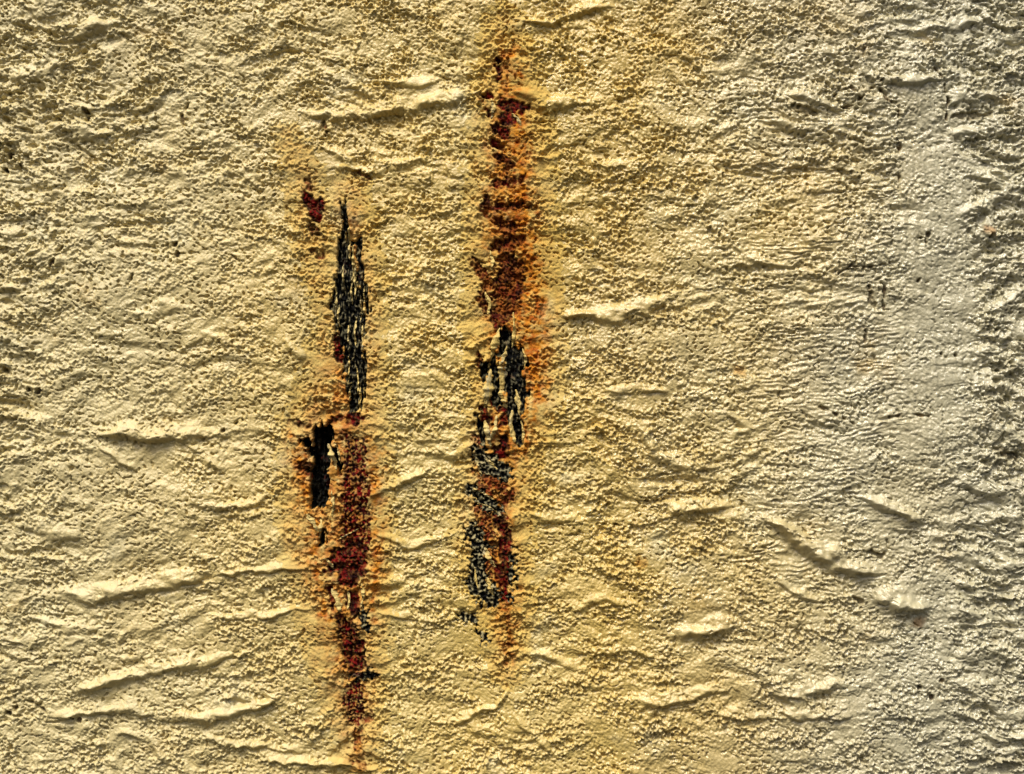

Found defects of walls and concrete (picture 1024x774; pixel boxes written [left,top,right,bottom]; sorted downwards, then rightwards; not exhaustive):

spalling [300,422,343,547]
corrosion [266,116,407,774]
spalling [328,198,372,428]
spalling [455,312,530,647]
corrosion [444,0,575,693]